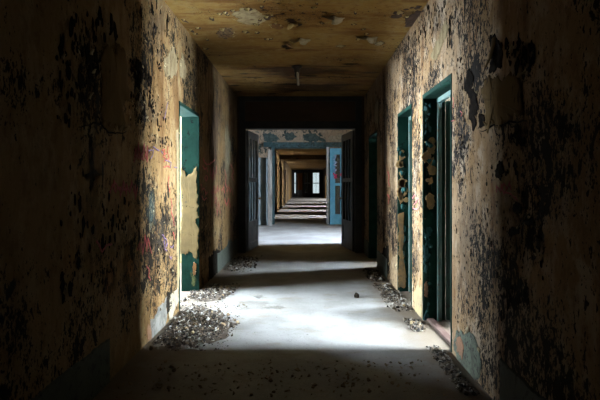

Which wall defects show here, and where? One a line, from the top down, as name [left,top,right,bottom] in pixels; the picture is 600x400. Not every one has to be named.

peeling [209,6,274,40]
peeling [484,32,535,76]
peeling [69,191,140,294]
peeling [129,57,200,341]
peeling [382,103,437,290]
flaking render [453,292,490,381]